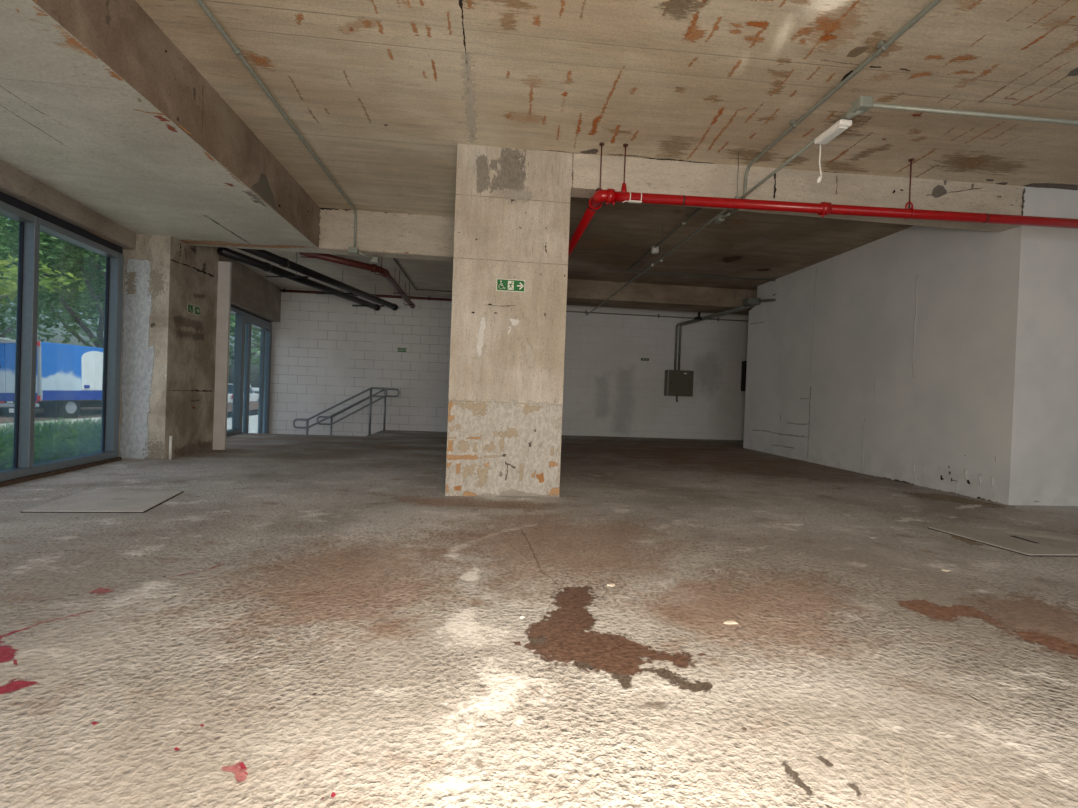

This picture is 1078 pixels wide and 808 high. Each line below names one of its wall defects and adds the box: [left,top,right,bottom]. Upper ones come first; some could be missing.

leakage [660,0,707,19]
rust [683,0,769,48]
crack [458,0,476,142]
rust [576,76,620,135]
rust [687,107,755,159]
peeling [445,398,563,498]
leakage [428,586,720,751]
leakage [417,771,486,797]